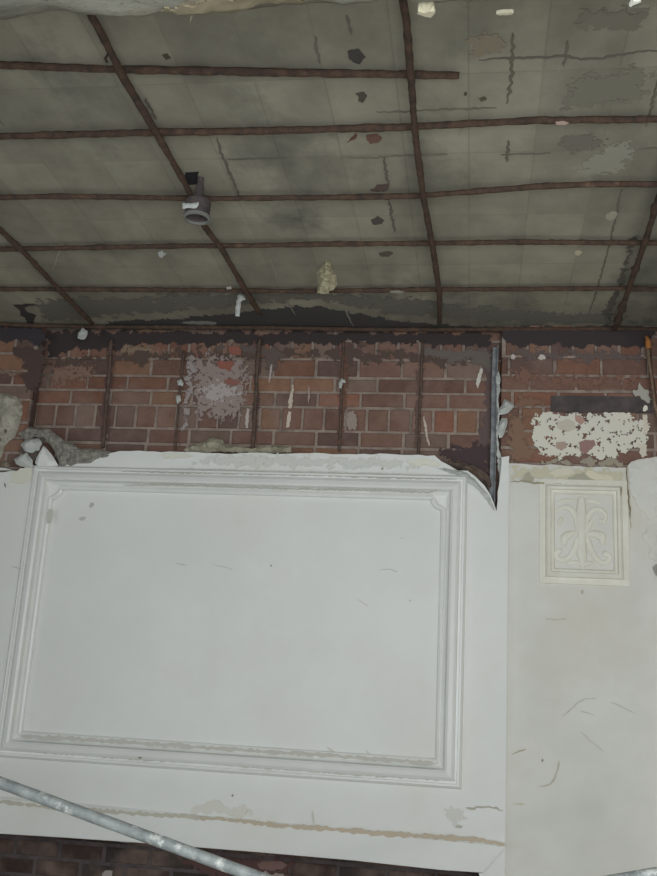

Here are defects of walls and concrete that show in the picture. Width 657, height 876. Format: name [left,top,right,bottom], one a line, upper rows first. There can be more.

spalling [0,0,657,331]
peeling [10,437,45,484]
peeling [531,383,652,495]